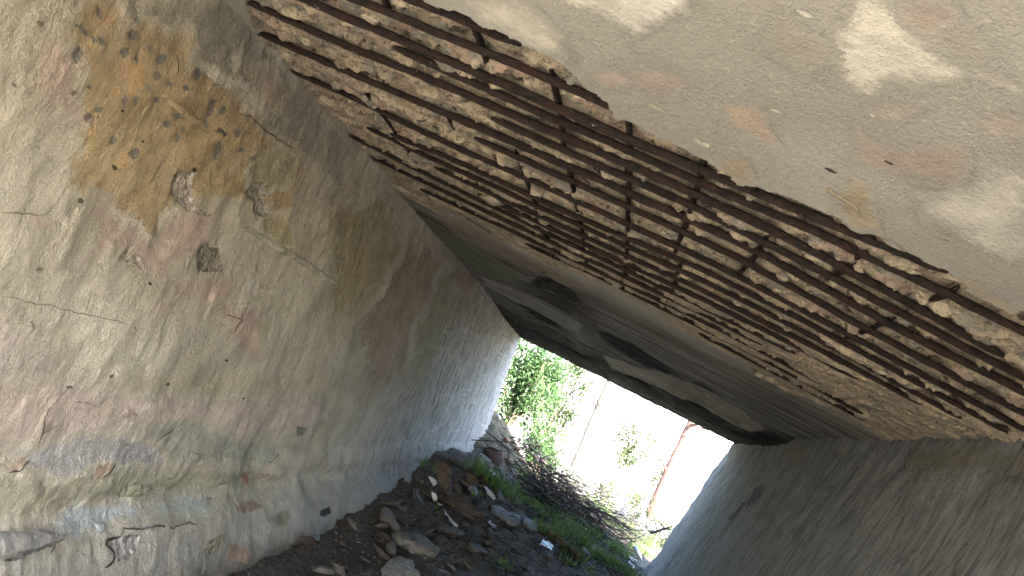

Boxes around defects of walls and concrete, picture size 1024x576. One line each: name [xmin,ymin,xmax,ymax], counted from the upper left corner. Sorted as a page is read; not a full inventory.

spalling [171,168,211,217]
spalling [242,0,1024,443]
spalling [197,244,222,272]
damp [0,0,601,551]
crack [2,290,137,331]
crack [3,539,65,562]
crack [105,521,197,568]